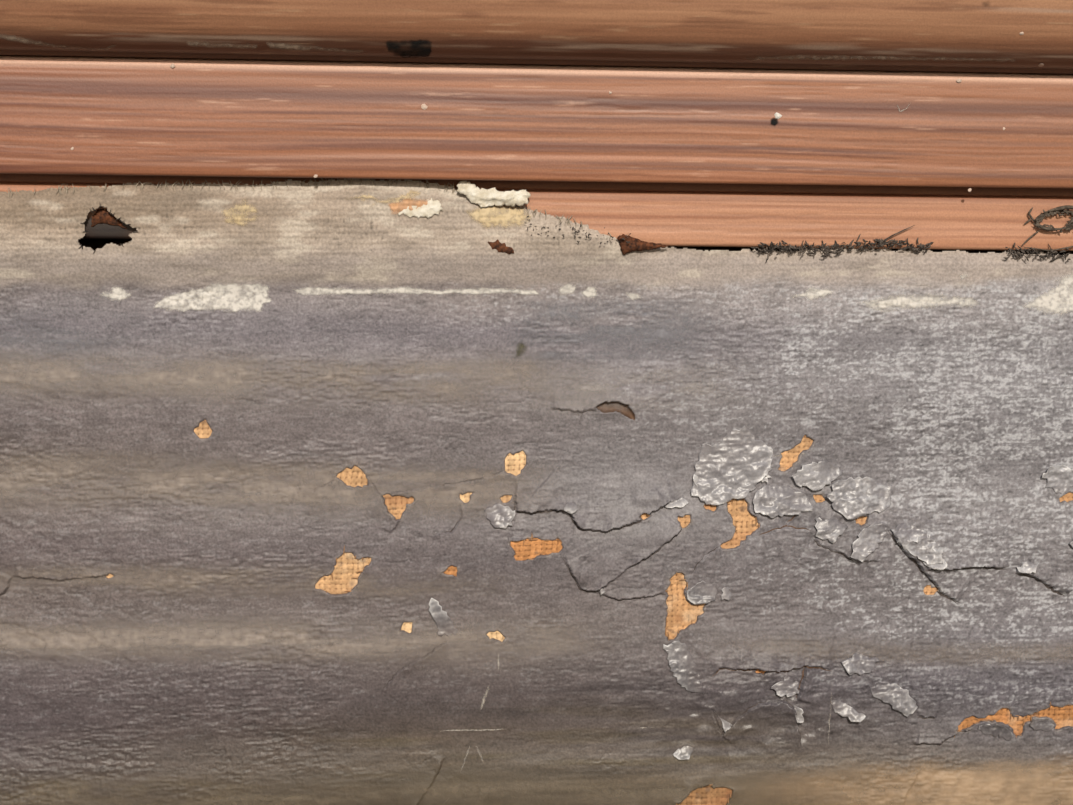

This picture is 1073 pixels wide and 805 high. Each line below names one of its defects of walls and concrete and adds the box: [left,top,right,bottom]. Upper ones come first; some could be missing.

peeling [505,450,526,476]
peeling [484,495,515,529]
peeling [665,425,947,570]
peeling [511,535,563,560]
crack [0,576,106,596]
peeling [315,545,371,594]
peeling [663,573,731,695]
peeling [770,676,804,723]
peeling [830,700,866,723]
peeling [841,652,918,717]
peeling [954,702,1073,741]
peeling [673,745,694,760]